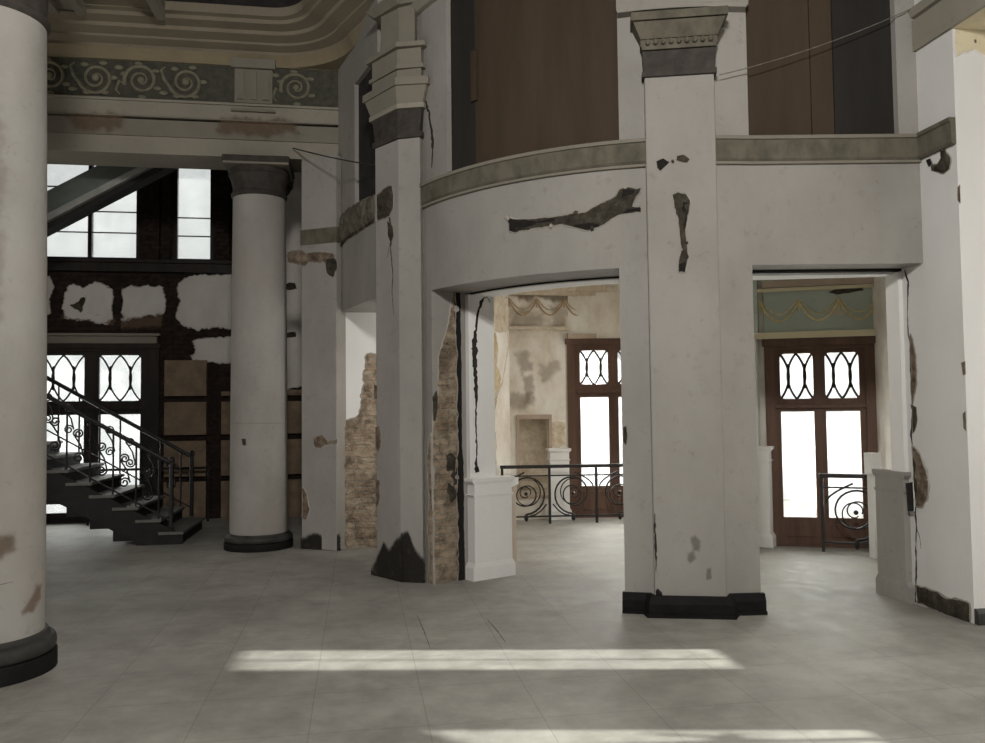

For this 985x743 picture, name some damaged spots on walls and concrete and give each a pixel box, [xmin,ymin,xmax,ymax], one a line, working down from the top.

flaking render [656,155,690,171]
flaking render [926,149,952,174]
flaking render [505,185,642,234]
flaking render [671,191,691,274]
peeling [47,274,232,364]
flaking render [313,352,382,549]
flaking render [427,293,459,585]